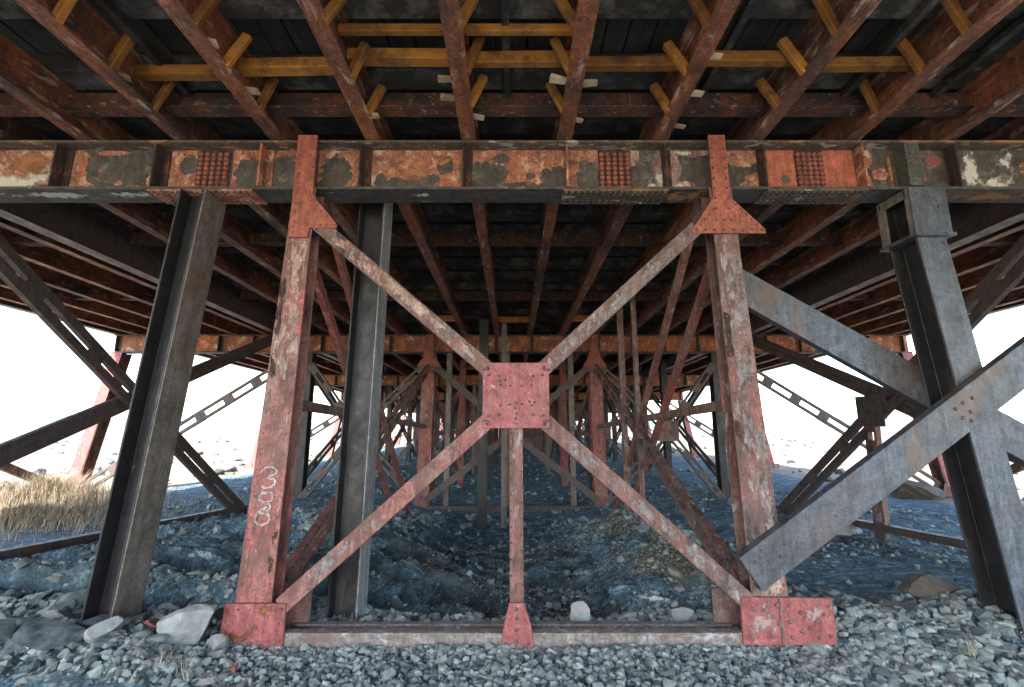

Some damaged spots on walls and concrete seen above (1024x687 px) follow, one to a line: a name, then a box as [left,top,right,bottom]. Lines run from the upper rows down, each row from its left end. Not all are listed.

peeling [0,150,54,185]
peeling [69,150,130,186]
peeling [371,150,598,186]
corrosion [946,192,1024,202]
corrosion [274,278,287,334]
corrosion [723,311,735,357]
corrosion [751,603,779,634]
corrosion [805,604,824,622]